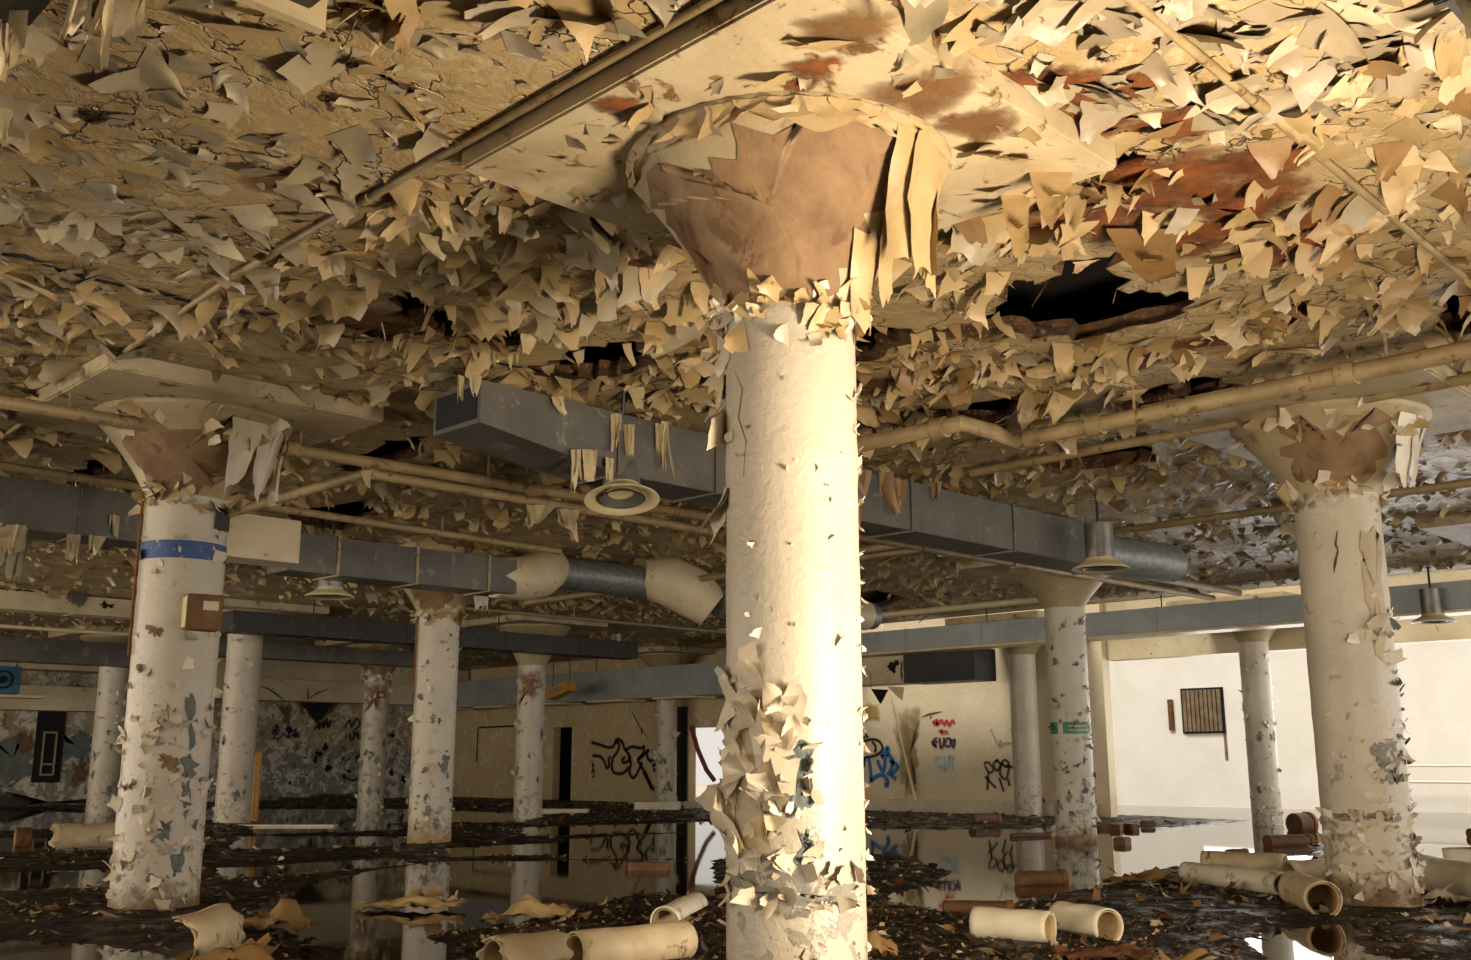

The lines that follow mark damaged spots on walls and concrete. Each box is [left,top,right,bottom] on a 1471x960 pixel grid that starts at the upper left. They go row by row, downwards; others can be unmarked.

water stain [800,11,894,50]
water stain [874,74,1014,142]
peeling [0,0,1471,697]
peeling [0,612,326,910]
peeling [273,644,458,833]
peeling [652,593,879,921]
peeling [1046,694,1101,838]
peeling [1239,650,1284,822]
peeling [1315,707,1428,907]